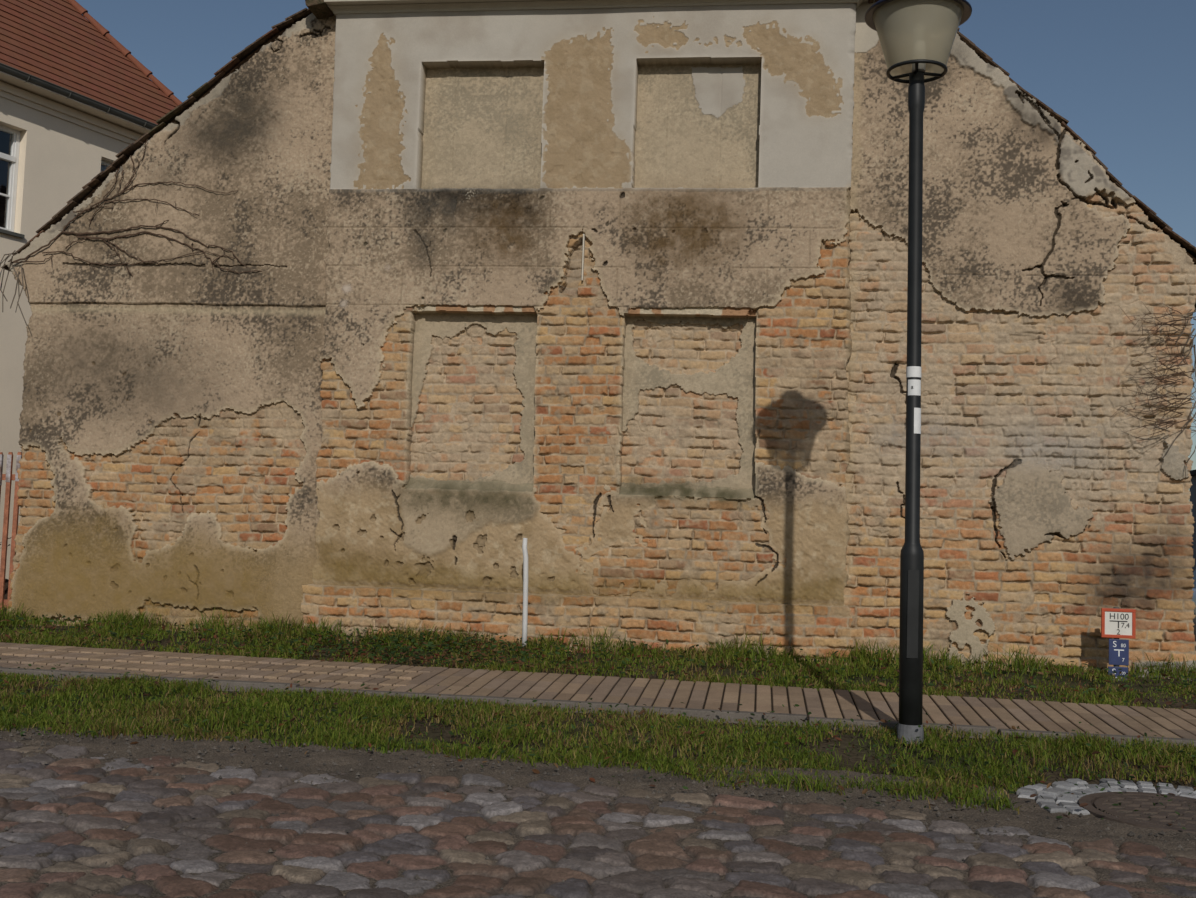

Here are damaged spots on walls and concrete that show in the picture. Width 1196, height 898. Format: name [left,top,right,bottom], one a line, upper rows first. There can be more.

peeling [354,33,411,189]
peeling [540,27,635,200]
peeling [634,19,844,117]
crack [1015,90,1159,306]
spalling [0,140,1196,681]